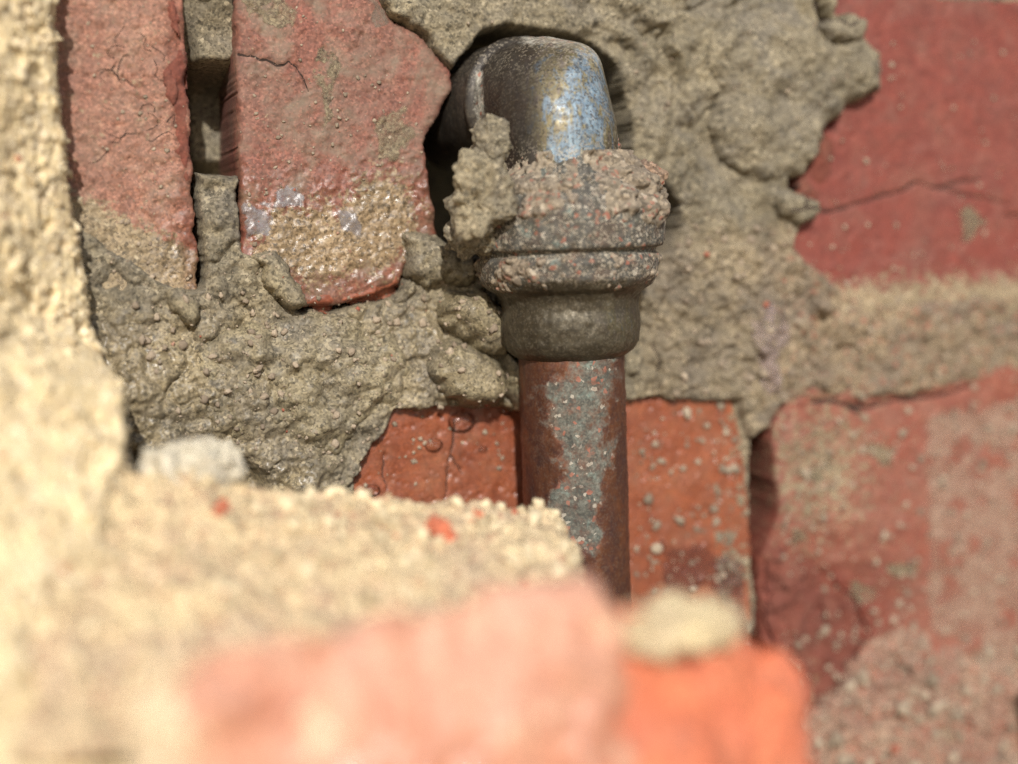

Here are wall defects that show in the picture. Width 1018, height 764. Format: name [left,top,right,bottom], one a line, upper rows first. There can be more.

crack [813,2,860,26]
crack [237,53,309,91]
crack [88,28,175,164]
crack [790,179,1018,217]